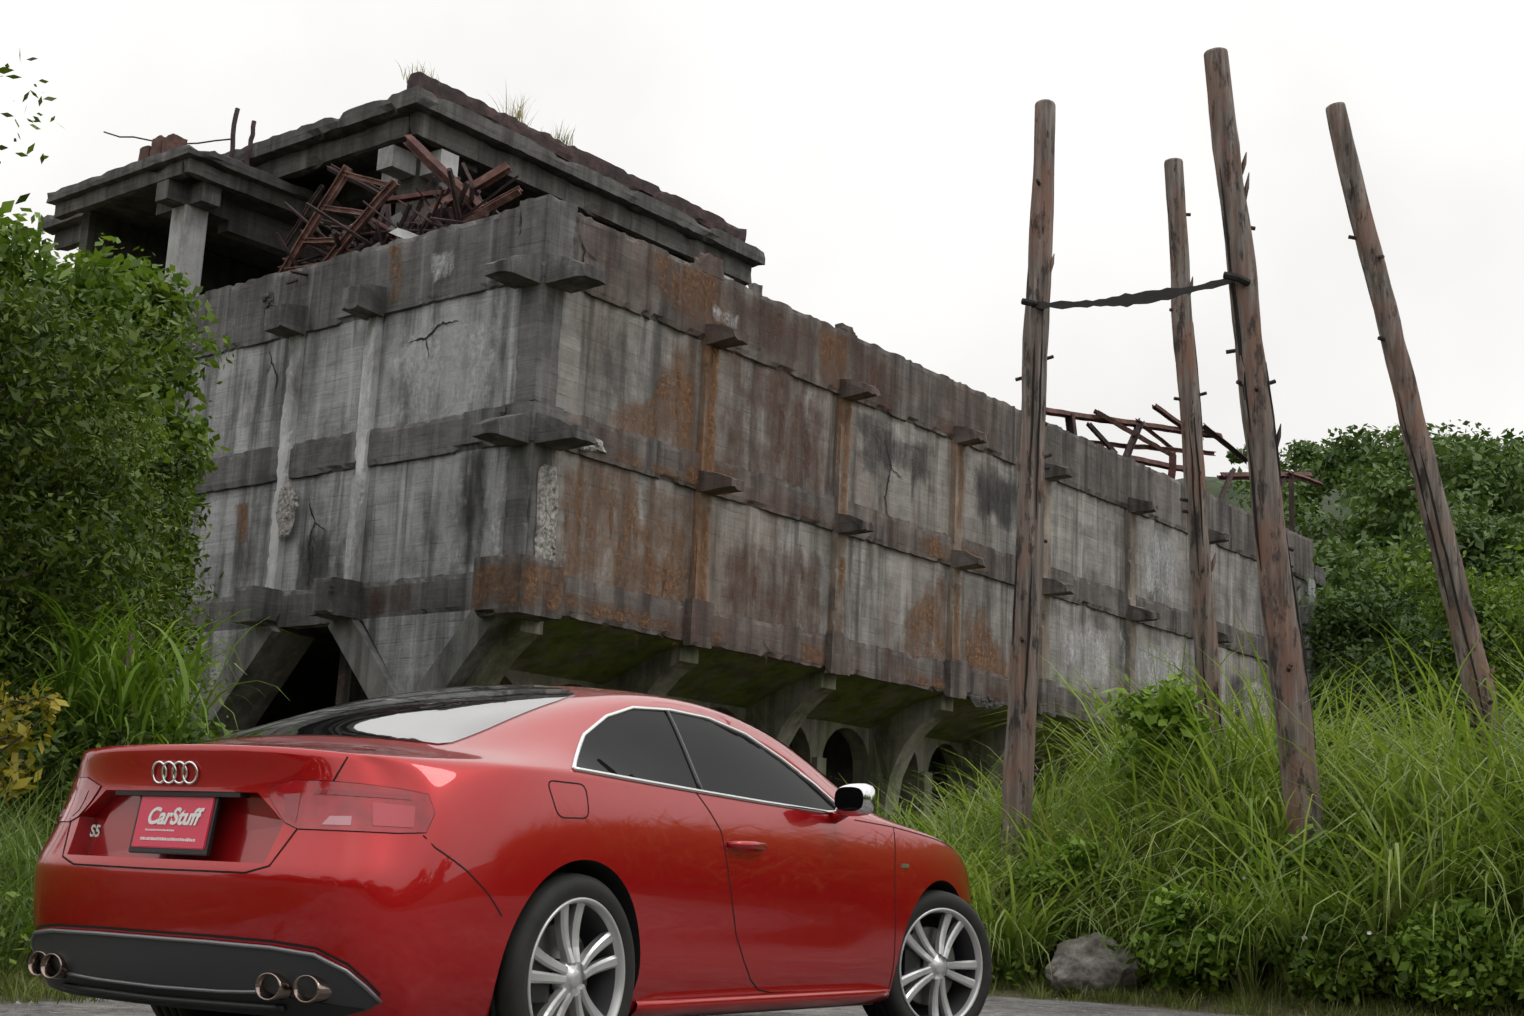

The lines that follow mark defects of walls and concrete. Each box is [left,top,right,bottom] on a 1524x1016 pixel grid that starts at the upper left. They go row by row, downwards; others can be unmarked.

crack [409,320,457,358]
corrosion [732,369,821,492]
corrosion [524,459,709,609]